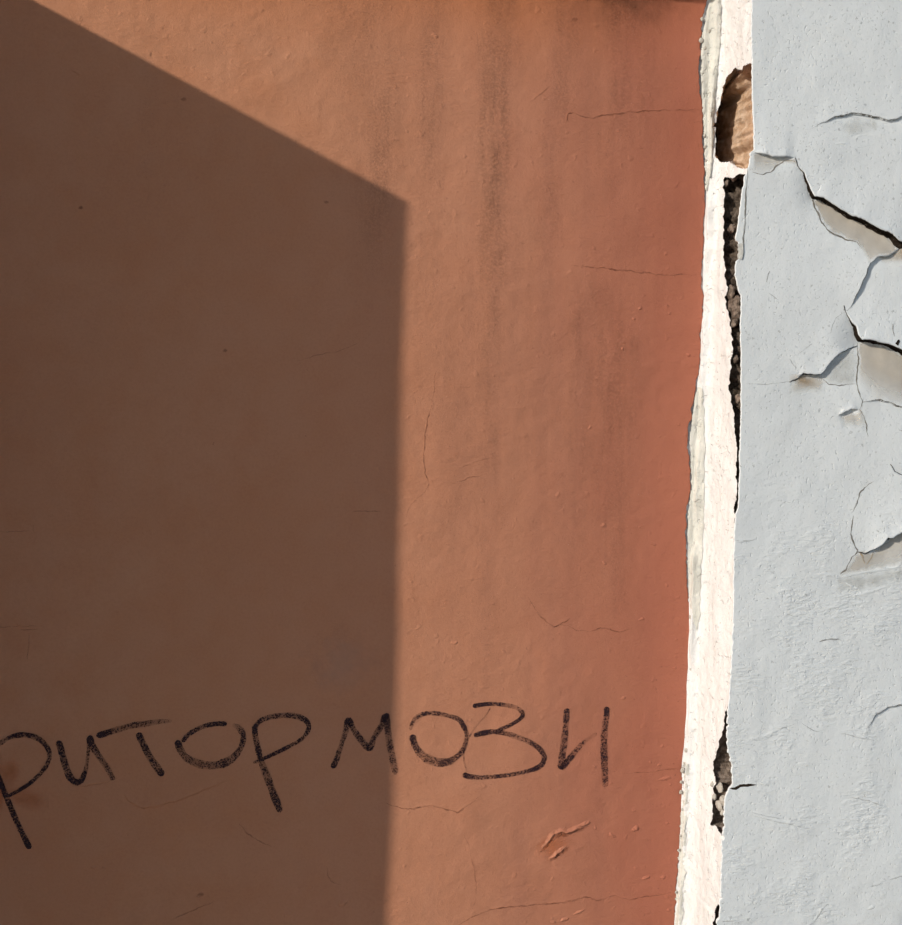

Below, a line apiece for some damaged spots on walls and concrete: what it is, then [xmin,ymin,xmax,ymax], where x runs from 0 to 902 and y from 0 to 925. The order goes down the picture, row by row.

peeling [700,0,902,255]
crack [723,161,748,522]
peeling [790,306,902,388]
peeling [816,517,902,598]
crack [462,892,659,922]